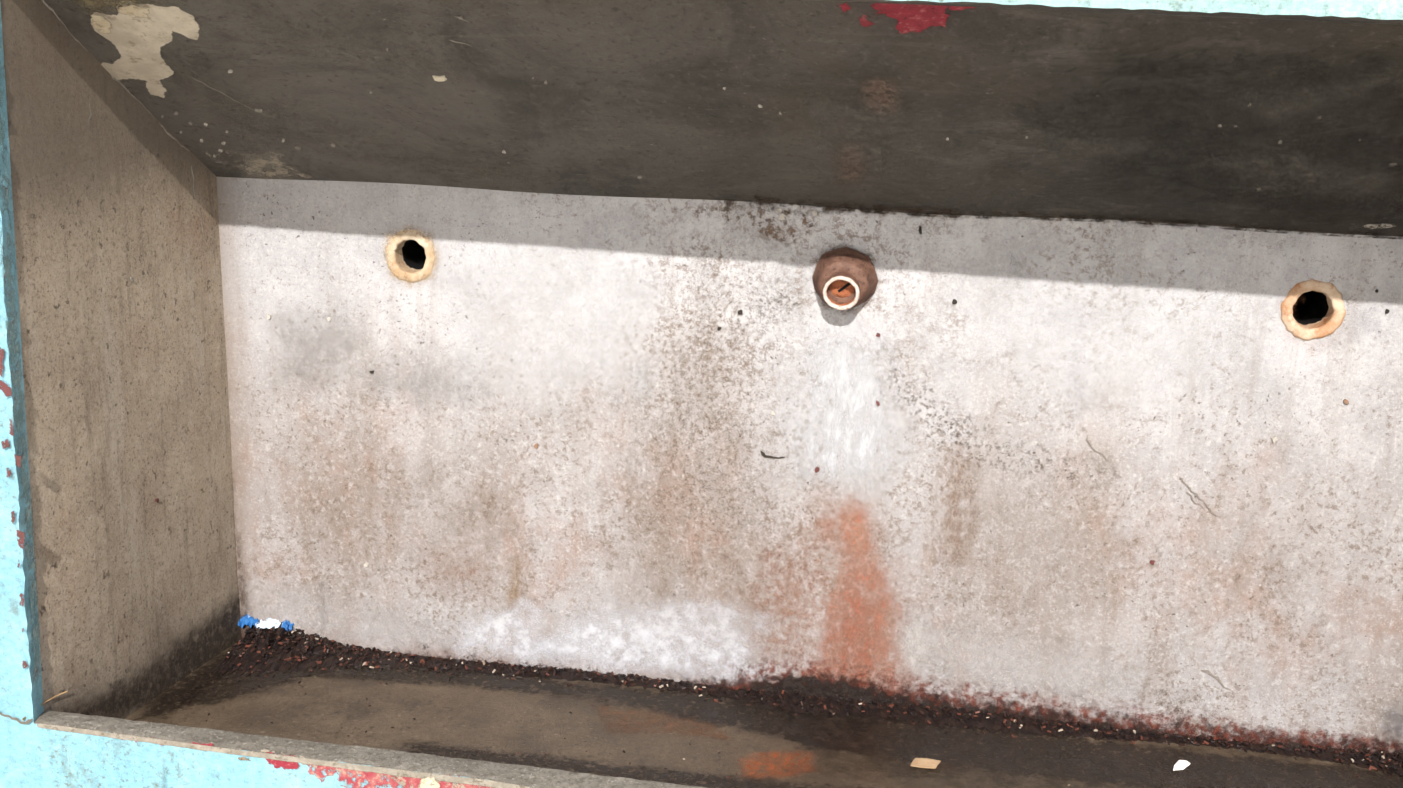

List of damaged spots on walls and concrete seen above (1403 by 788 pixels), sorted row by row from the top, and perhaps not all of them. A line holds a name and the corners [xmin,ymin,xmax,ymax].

peeling [837,3,991,34]
spalling [75,0,200,98]
leakage [424,602,1403,756]
crack [0,712,33,724]
peeling [238,749,492,788]